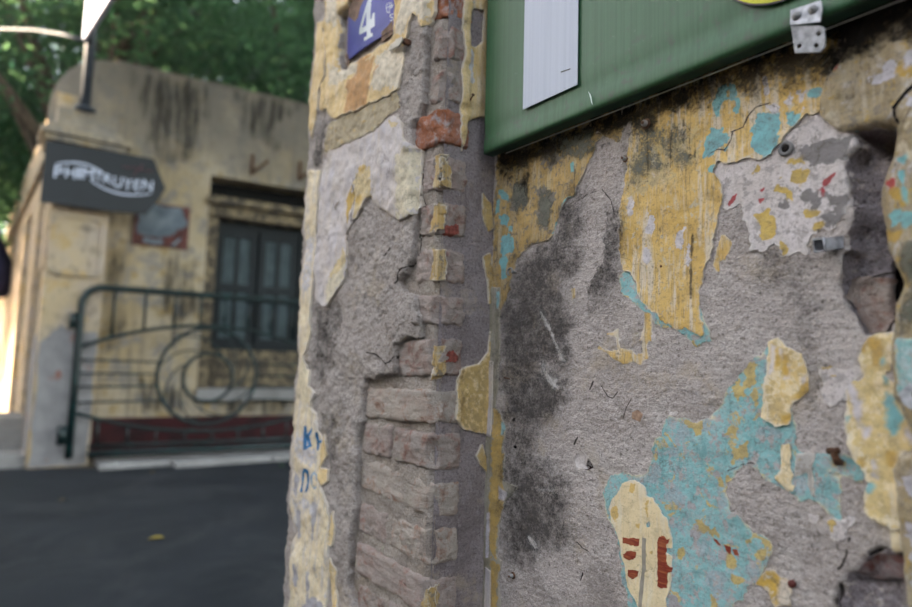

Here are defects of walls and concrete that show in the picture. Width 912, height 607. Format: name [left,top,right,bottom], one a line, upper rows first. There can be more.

water stain [142,75,206,158]
flaking render [283,0,912,607]
water stain [491,0,912,565]
crack [892,85,912,124]